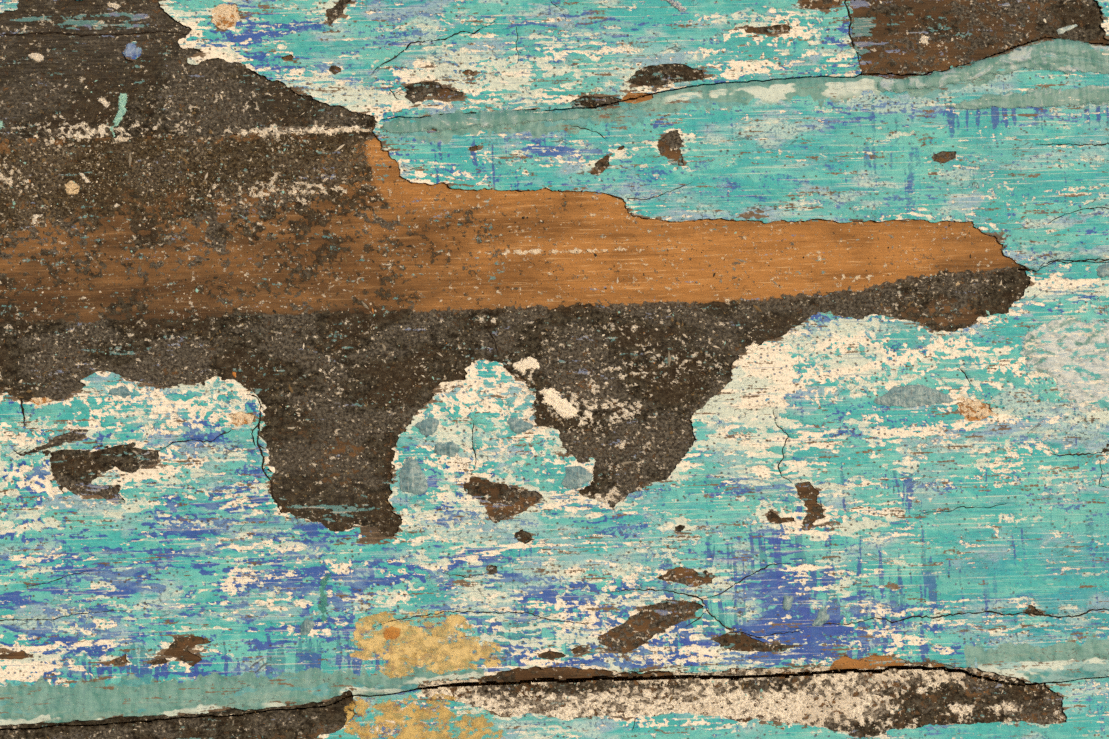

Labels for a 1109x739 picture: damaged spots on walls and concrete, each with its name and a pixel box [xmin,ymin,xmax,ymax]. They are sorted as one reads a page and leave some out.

crack [844,0,862,75]
peeling [801,0,1109,79]
peeling [0,0,1031,537]
peeling [514,529,533,544]
peeling [658,567,713,587]
peeling [417,600,1067,738]
peeling [0,690,356,739]